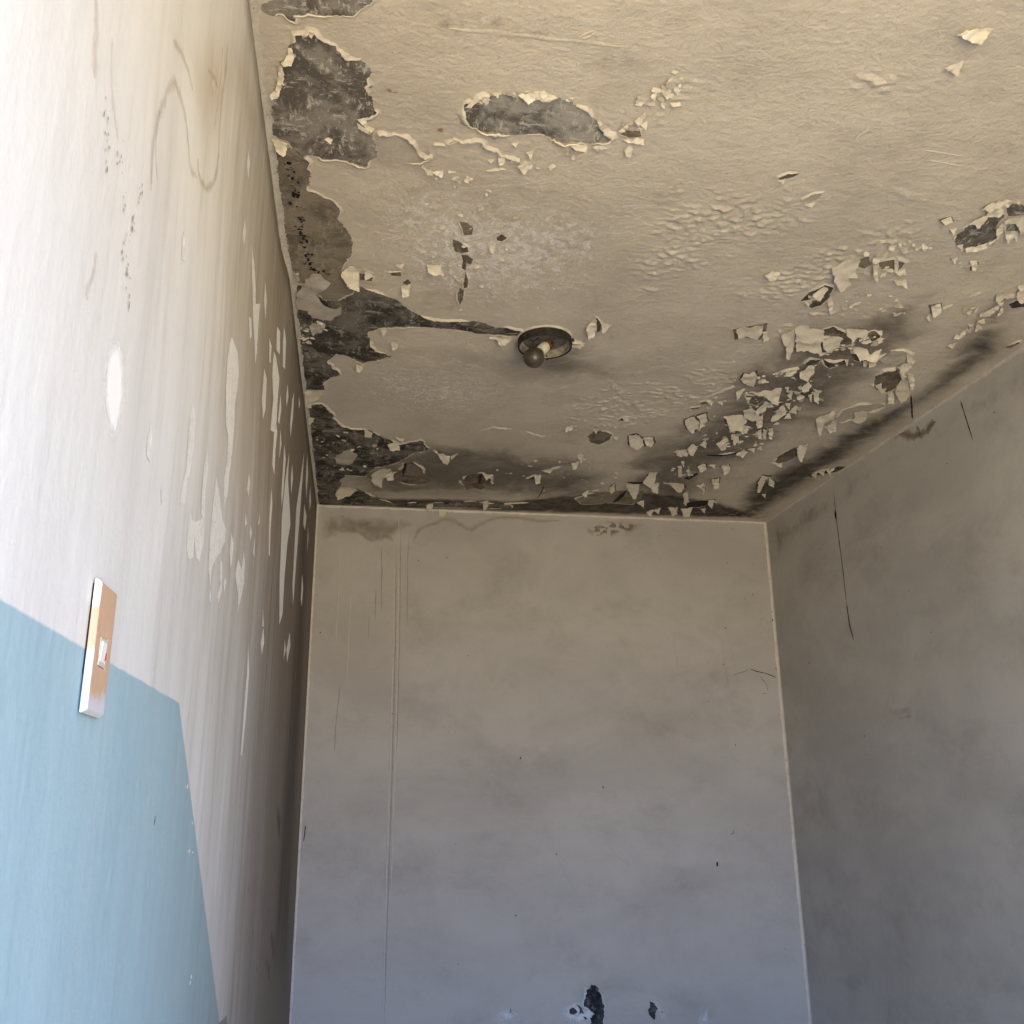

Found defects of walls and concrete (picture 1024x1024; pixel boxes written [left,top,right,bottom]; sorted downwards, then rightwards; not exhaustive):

leakage [284,162,330,276]
peeling [261,0,934,517]
peeling [939,199,1024,272]
leakage [949,333,992,378]
leakage [377,321,909,533]
crack [834,499,854,640]
flaking render [569,984,606,1024]